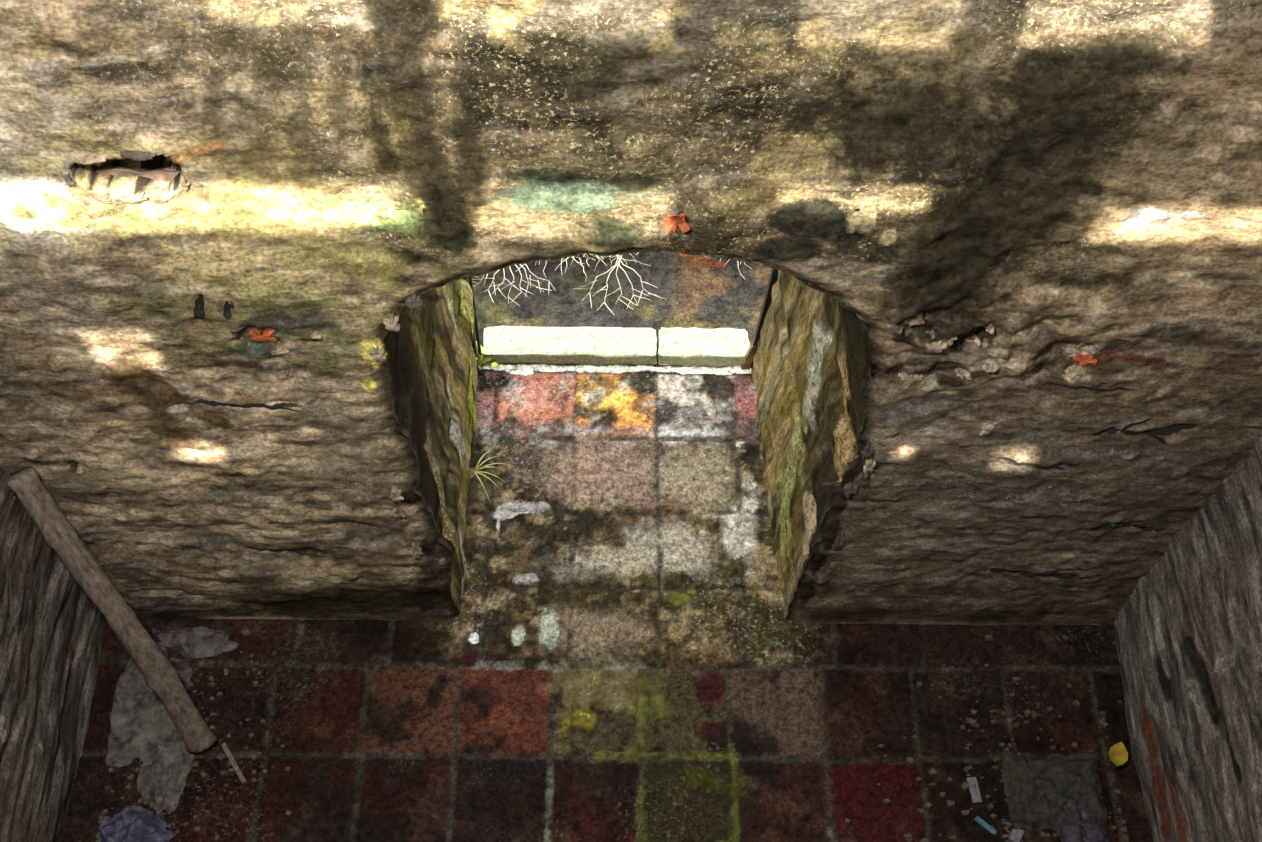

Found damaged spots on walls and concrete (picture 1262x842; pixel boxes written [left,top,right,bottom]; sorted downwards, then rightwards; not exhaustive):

spalling [64,140,223,205]